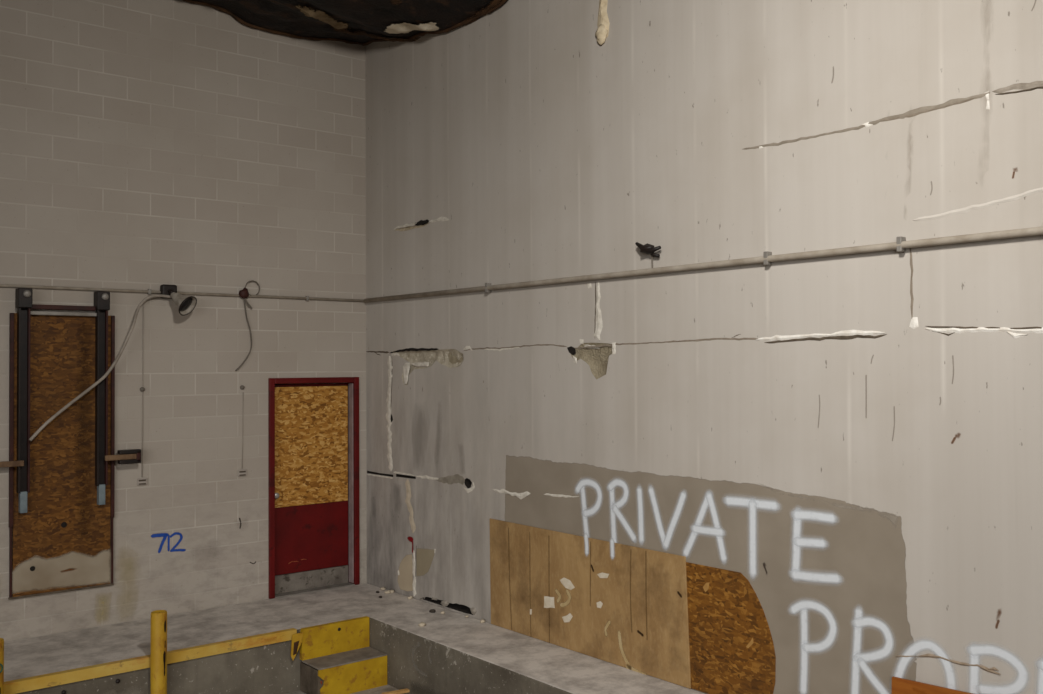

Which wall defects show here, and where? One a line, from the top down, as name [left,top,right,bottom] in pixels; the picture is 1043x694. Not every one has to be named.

peeling [295,6,350,29]
peeling [384,22,439,34]
spalling [390,348,464,385]
spalling [567,339,616,379]